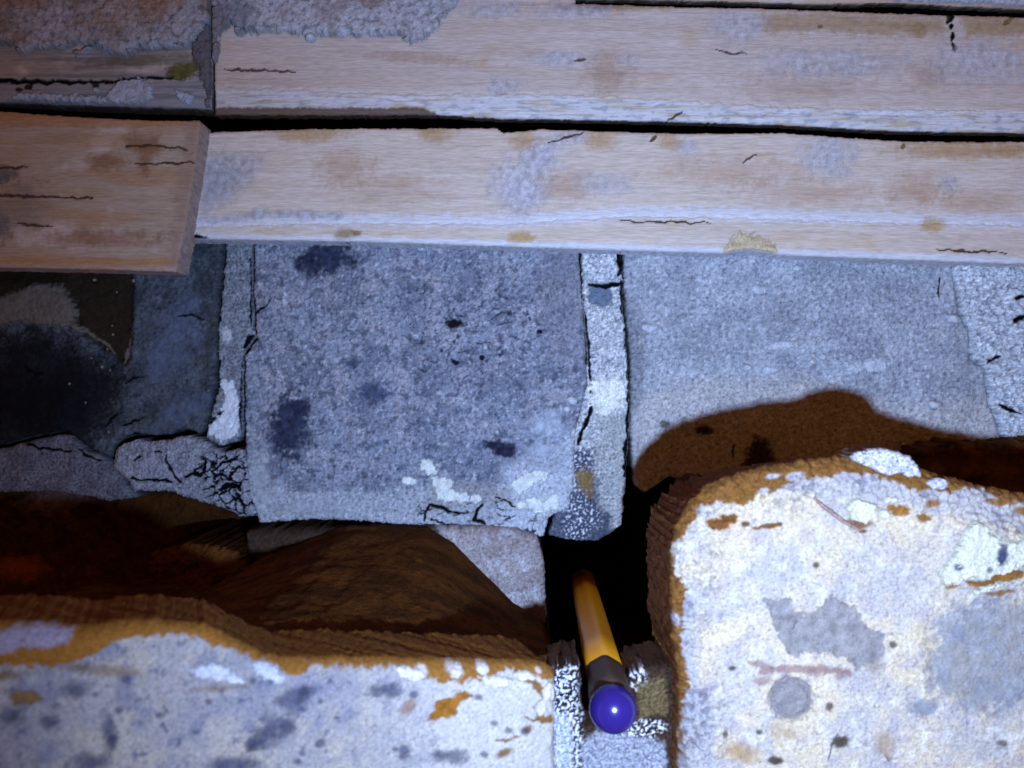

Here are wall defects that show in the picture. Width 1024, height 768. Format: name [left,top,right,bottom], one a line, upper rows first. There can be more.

leakage [295,231,360,275]
leakage [222,327,233,341]
crack [105,258,272,515]
crack [577,269,629,477]
leakage [208,379,240,443]
leakage [248,390,310,509]
leakage [402,459,482,504]
crack [418,497,536,533]
leakage [510,470,560,517]